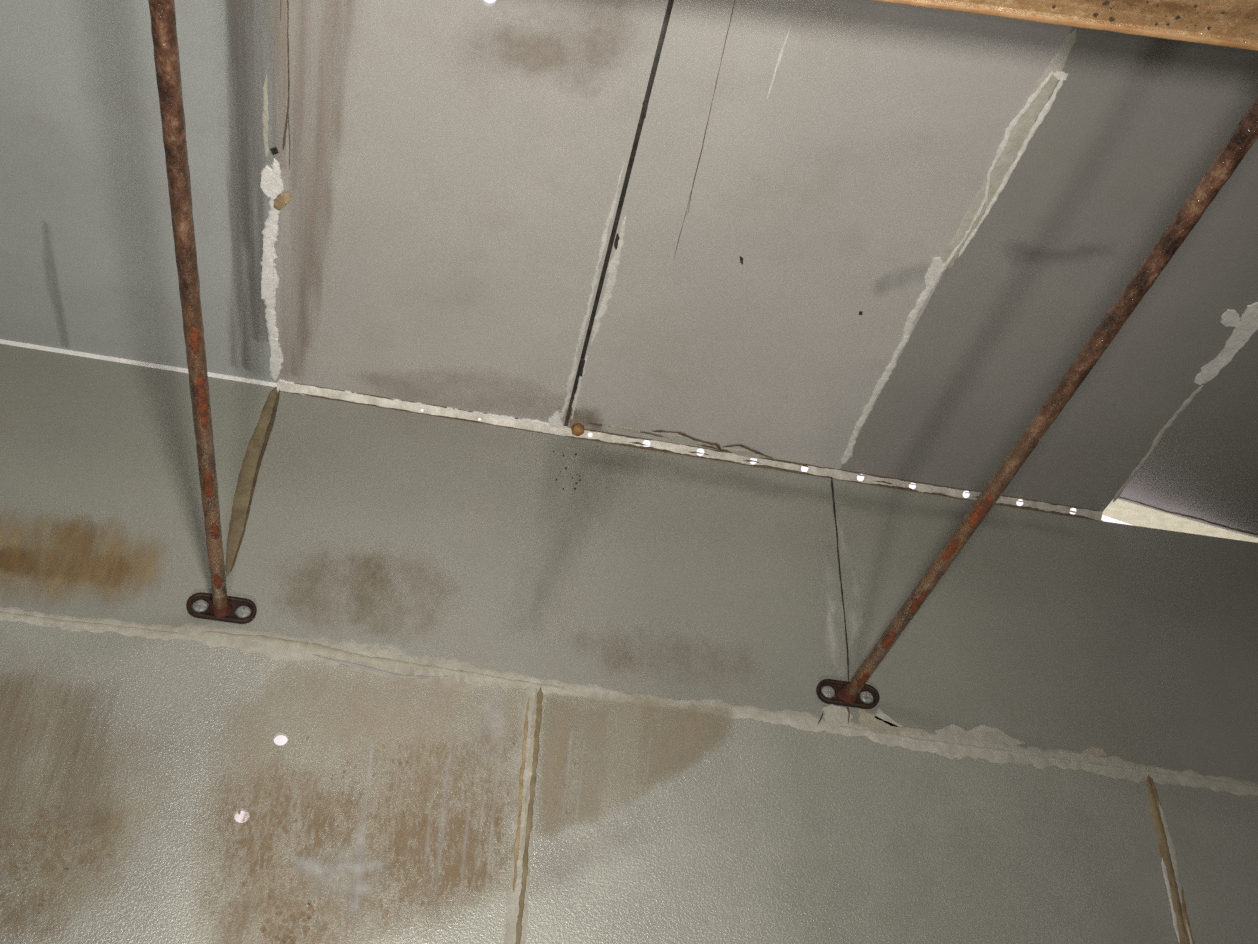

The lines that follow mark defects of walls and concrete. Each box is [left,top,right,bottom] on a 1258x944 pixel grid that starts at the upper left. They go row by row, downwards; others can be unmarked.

spalling [273,193,292,210]
peeling [1220,309,1241,327]
damp [229,727,515,944]